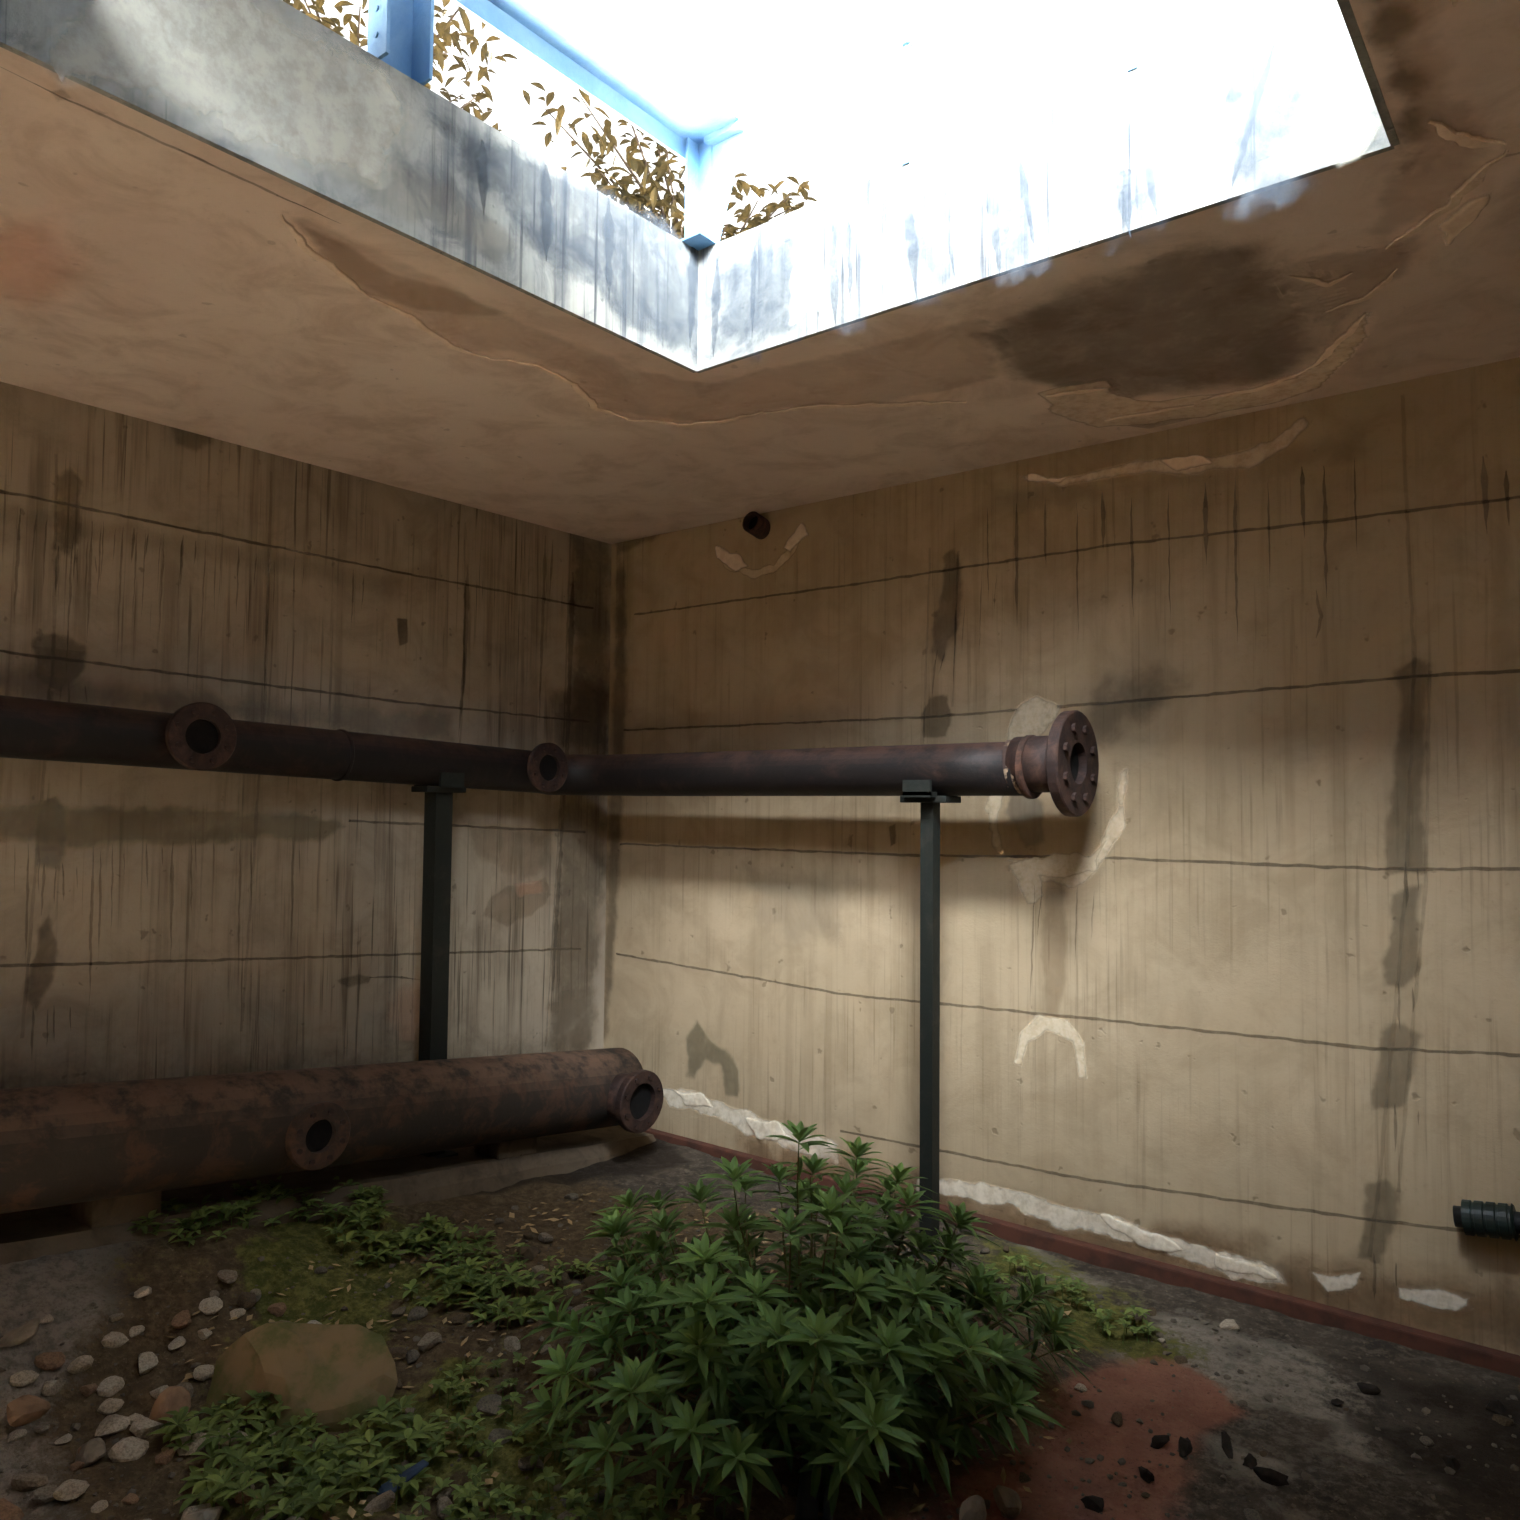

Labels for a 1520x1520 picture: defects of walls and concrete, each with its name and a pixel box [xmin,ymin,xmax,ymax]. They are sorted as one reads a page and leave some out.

flaking render [1315,106,1377,162]
spalling [1386,122,1509,250]
water stain [0,805,337,846]
efflorescence [939,1181,1278,1282]